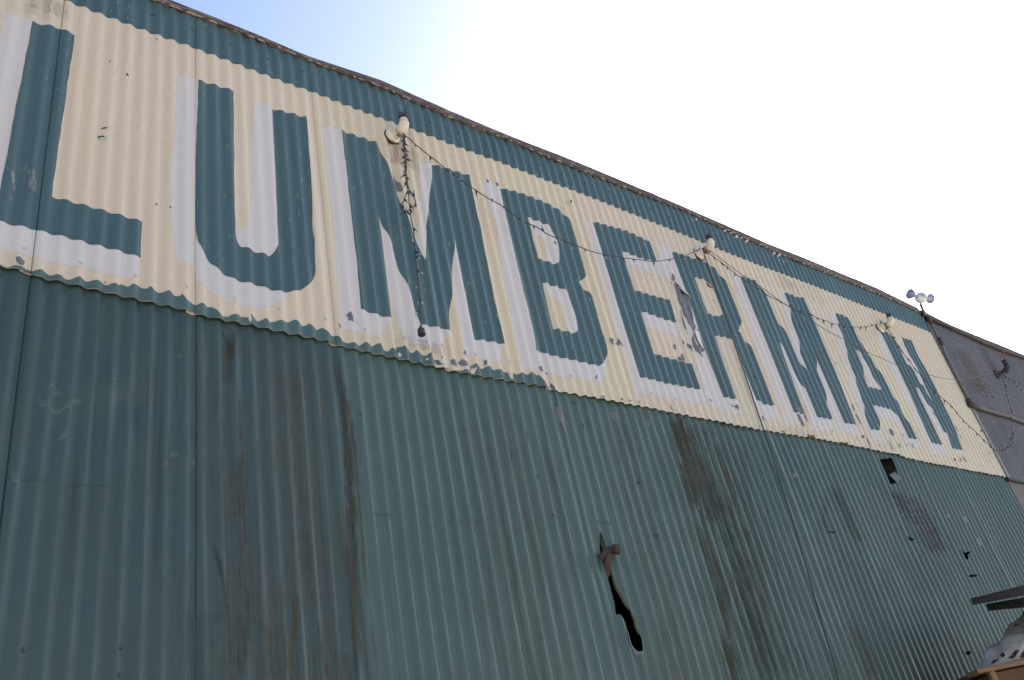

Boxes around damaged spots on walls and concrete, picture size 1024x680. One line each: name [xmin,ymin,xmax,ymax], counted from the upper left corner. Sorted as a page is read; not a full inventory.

peeling [426,351,493,374]
peeling [670,274,705,361]
water stain [339,381,373,650]
water stain [671,419,773,680]